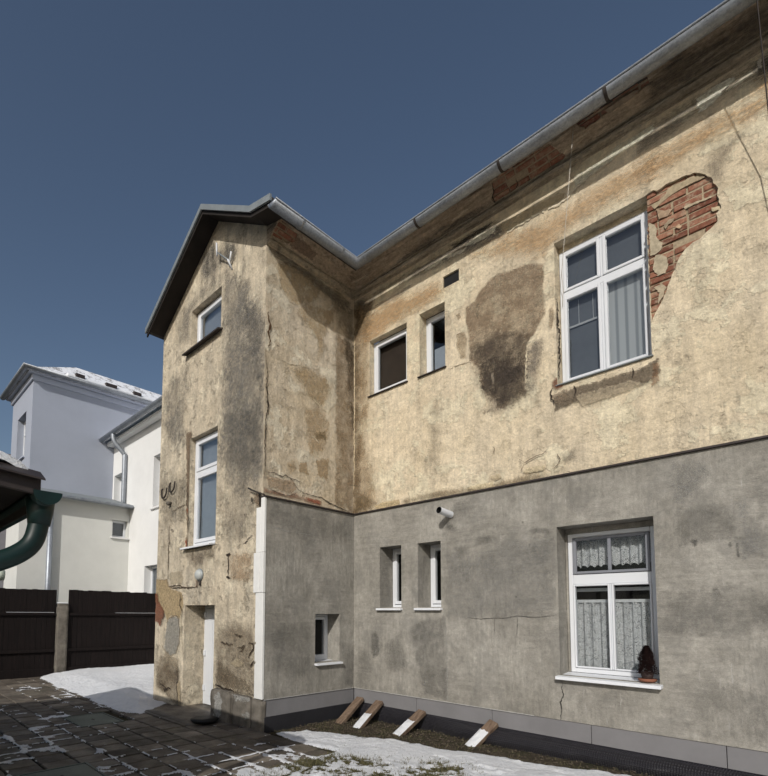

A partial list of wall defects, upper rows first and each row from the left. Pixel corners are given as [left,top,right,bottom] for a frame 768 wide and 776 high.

water stain [640,56,768,151]
peeling [465,124,654,246]
flaking render [647,174,721,319]
water stain [221,281,262,480]
crack [264,312,347,511]
water stain [270,221,504,513]
water stain [466,265,545,408]
flaking render [550,358,661,411]
peeling [155,579,183,626]